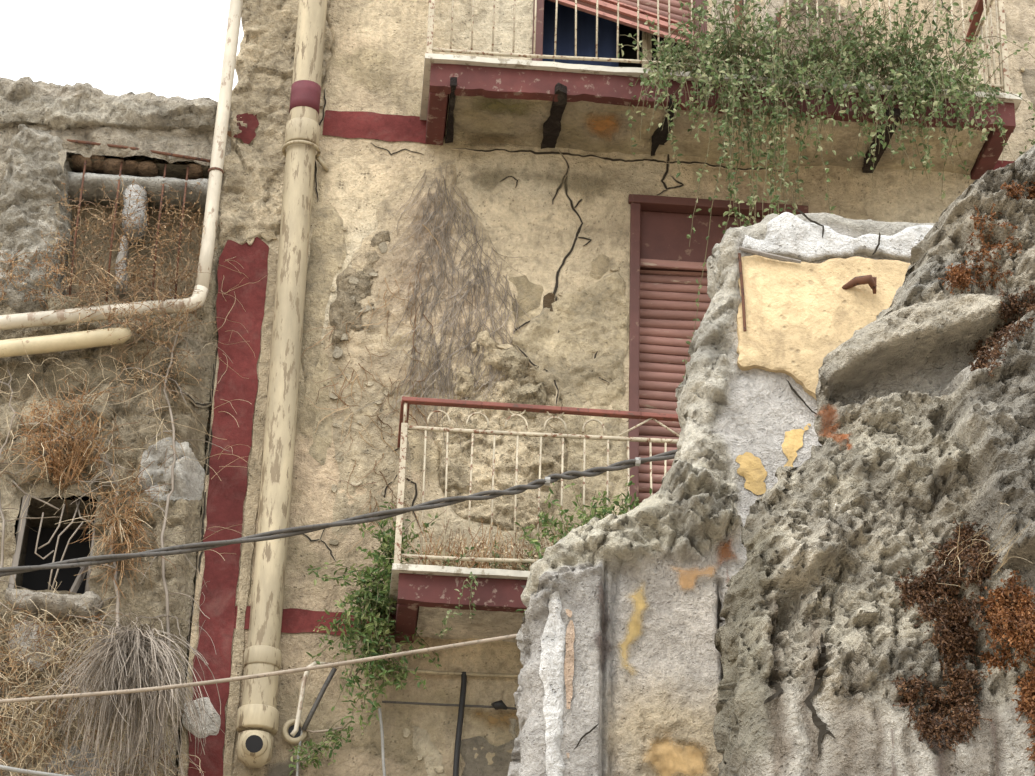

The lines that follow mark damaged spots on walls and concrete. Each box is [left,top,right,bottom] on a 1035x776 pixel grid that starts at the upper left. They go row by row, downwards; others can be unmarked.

crack [370,143,424,156]
crack [453,148,794,406]
flaking render [737,212,933,400]
crack [787,380,817,415]
rust [819,406,852,450]
crack [717,586,725,629]